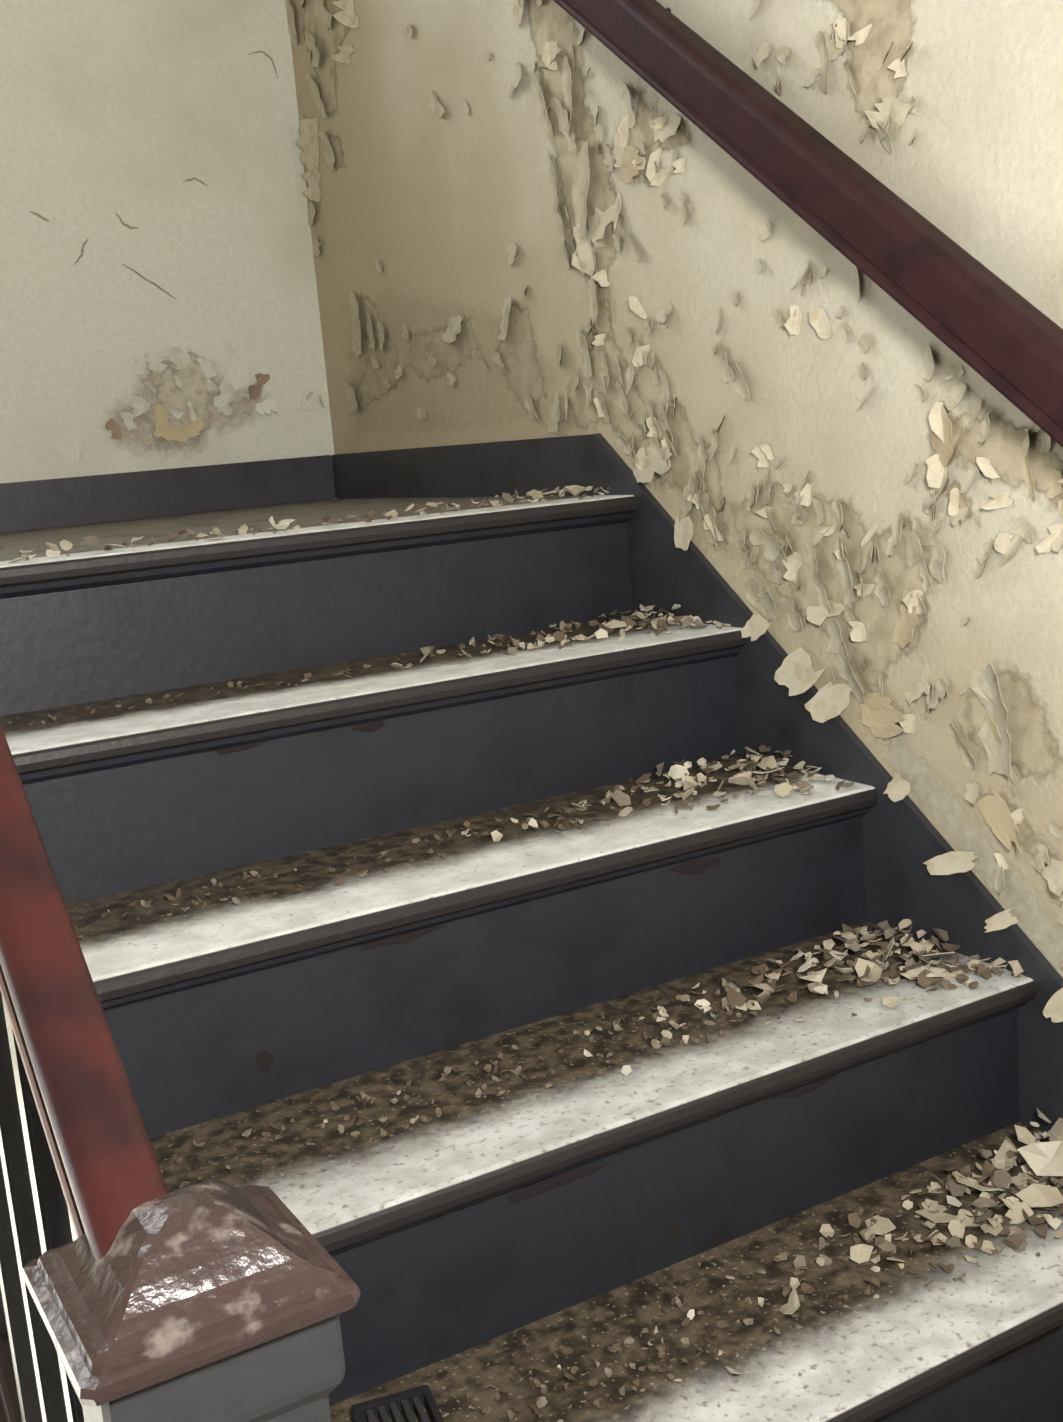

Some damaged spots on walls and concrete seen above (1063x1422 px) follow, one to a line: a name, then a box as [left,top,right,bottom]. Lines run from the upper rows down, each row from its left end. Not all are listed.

peeling [285,0,360,256]
peeling [105,347,278,448]
peeling [341,0,1063,967]
peeling [1043,988,1063,1023]